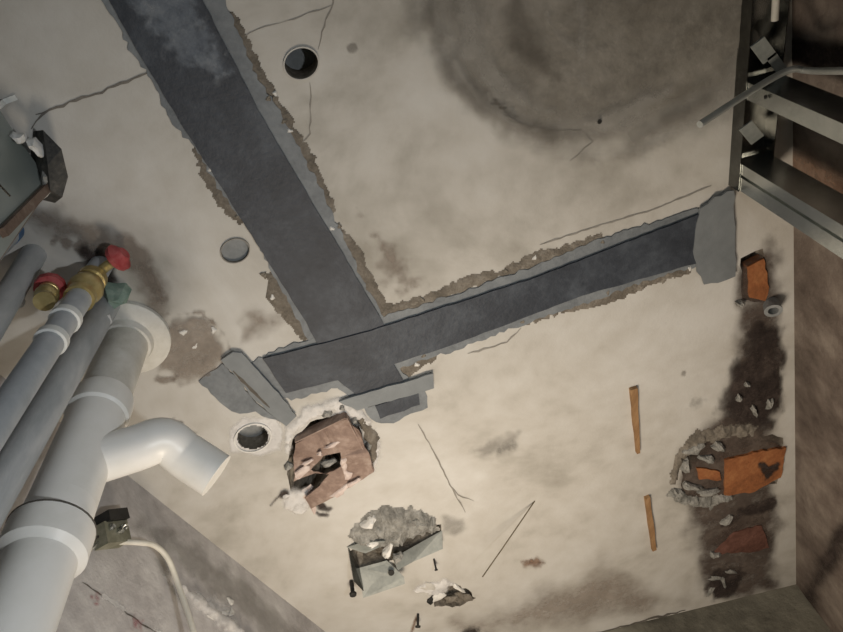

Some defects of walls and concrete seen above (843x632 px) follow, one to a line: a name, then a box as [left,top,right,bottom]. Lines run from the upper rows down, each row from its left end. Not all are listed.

crack [245,0,334,49]
leakage [792,39,843,67]
crack [31,73,147,129]
crack [302,86,312,143]
spalling [735,249,769,308]
spalling [666,322,786,511]
spalling [270,399,380,514]
spalling [351,524,441,568]
spalling [710,497,777,559]
peeling [706,569,737,597]